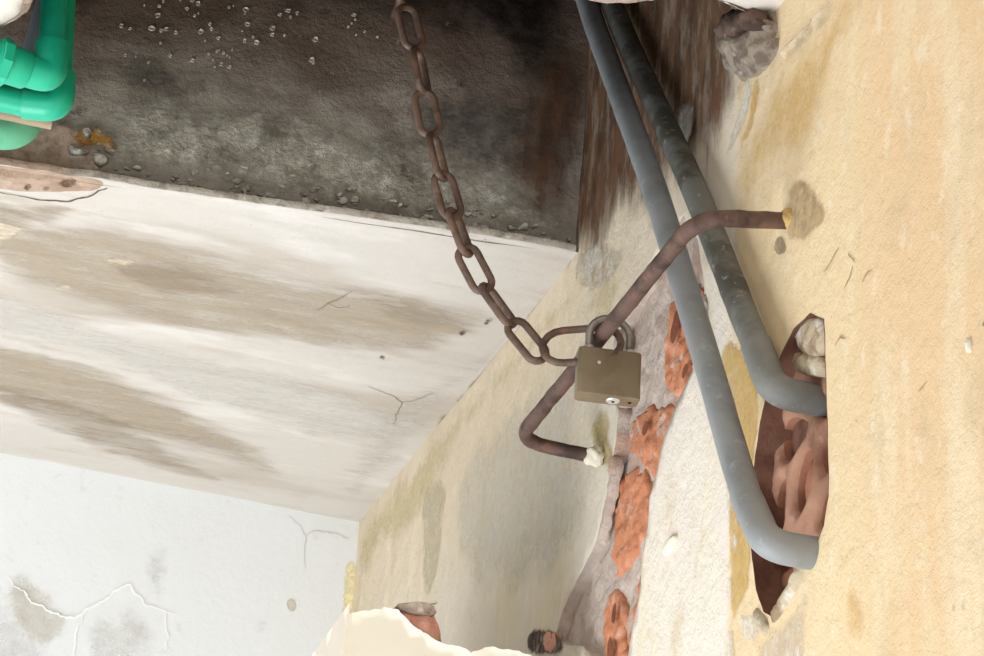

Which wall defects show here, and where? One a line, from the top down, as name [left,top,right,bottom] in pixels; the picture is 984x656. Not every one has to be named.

spalling [0,0,588,249]
leakage [98,72,576,242]
corrosion [576,41,642,241]
corrosion [600,6,668,171]
corrosion [624,0,734,150]
leakage [0,350,236,449]
leakage [0,232,465,343]
flaking render [527,270,695,656]
spalling [721,344,793,529]
spalling [779,313,826,378]
flaking render [394,601,442,643]
spalling [727,498,806,640]